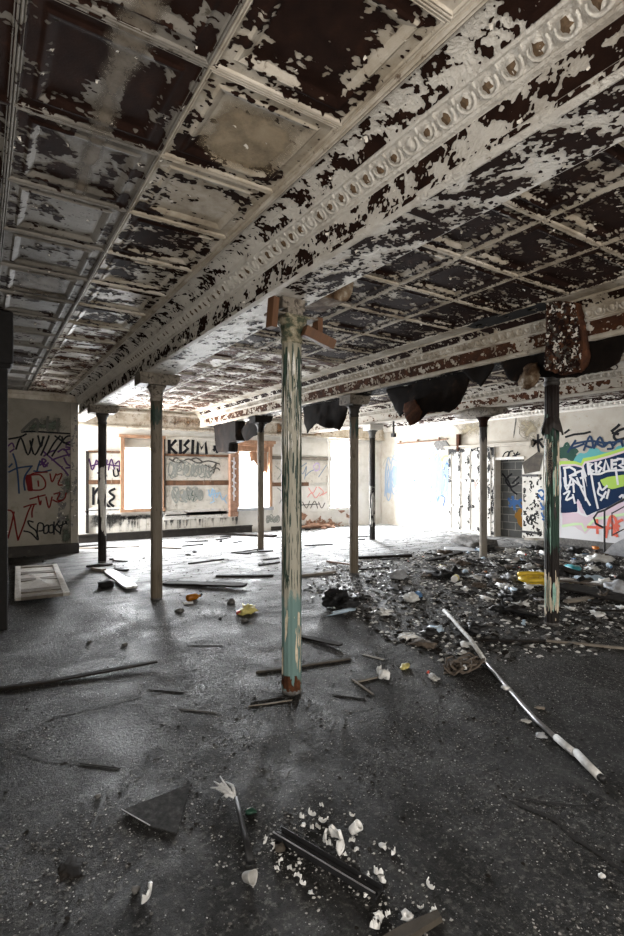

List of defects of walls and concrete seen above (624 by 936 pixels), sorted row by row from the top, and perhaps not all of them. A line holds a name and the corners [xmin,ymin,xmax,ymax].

leakage [203,107,291,169]
peeling [0,0,624,597]
peeling [540,569,567,622]
peeling [156,632,603,796]
peeling [1,809,139,912]